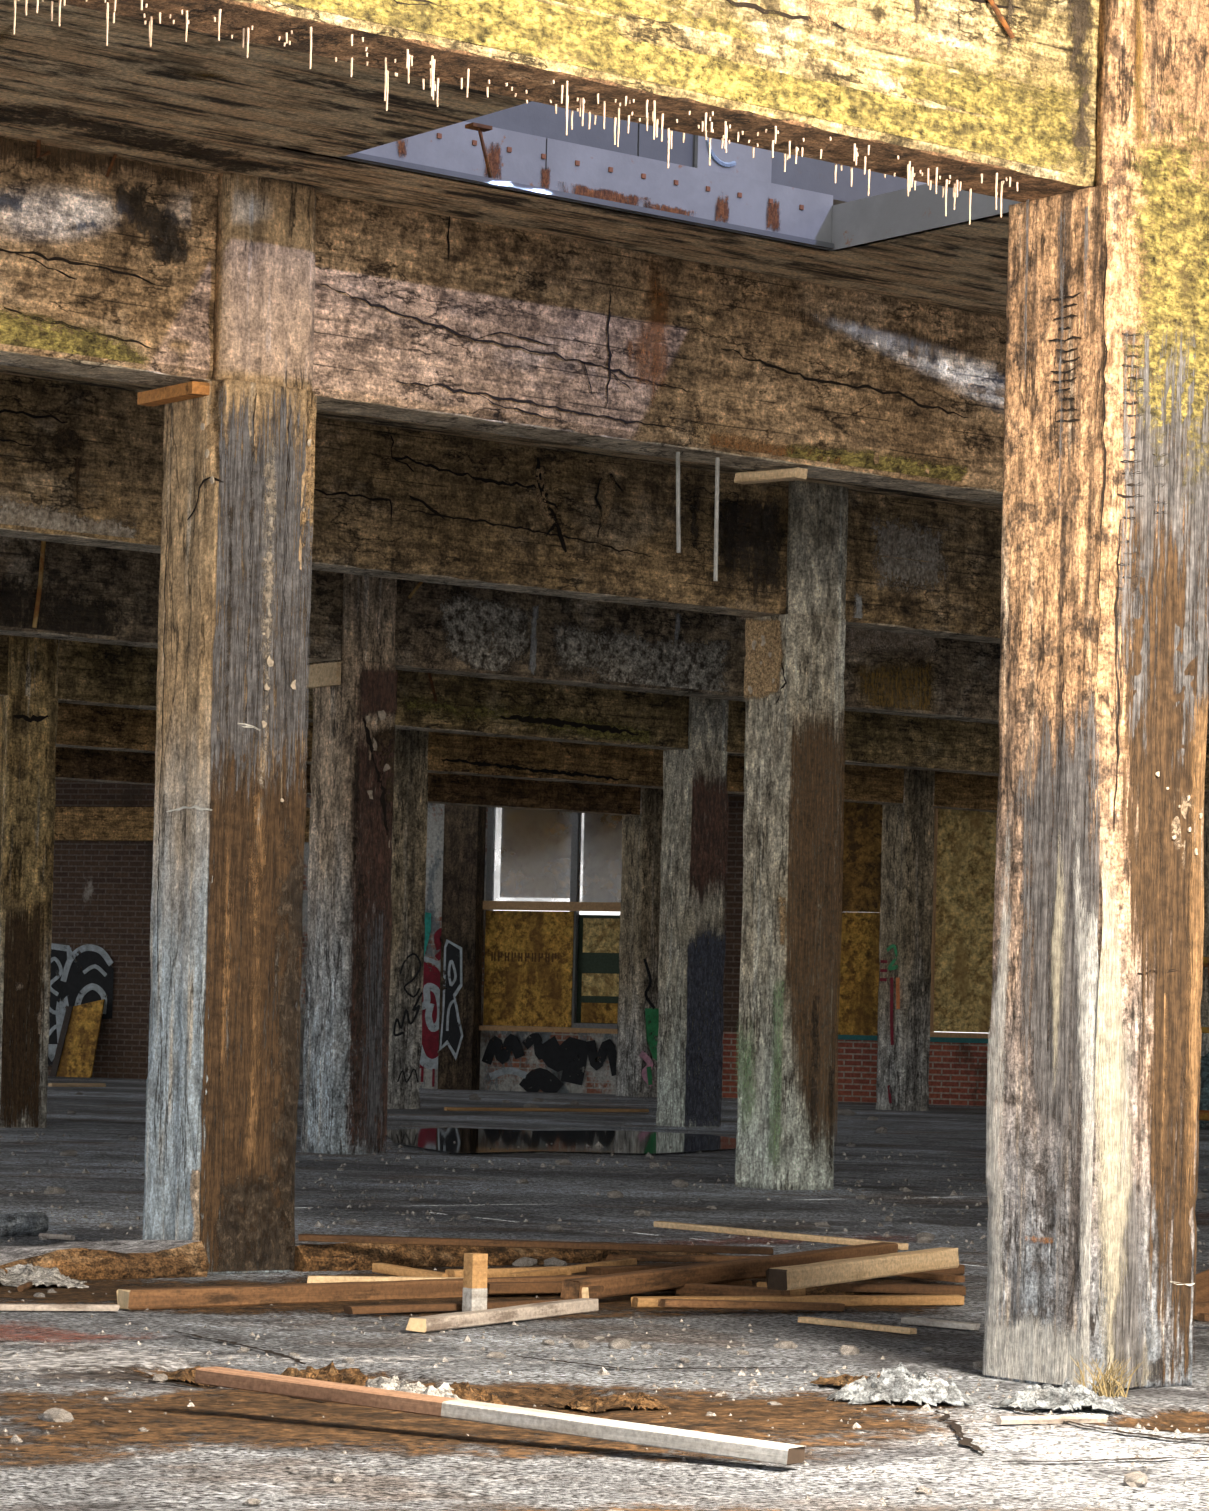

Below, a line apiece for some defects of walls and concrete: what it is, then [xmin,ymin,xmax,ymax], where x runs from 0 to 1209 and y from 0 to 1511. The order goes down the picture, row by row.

crack [394,0,449,11]
rust [398,140,408,157]
rust [485,143,502,179]
rust [541,168,694,216]
rust [715,196,729,223]
crack [321,284,690,430]
crack [157,393,652,970]
crack [934,1404,1209,1462]